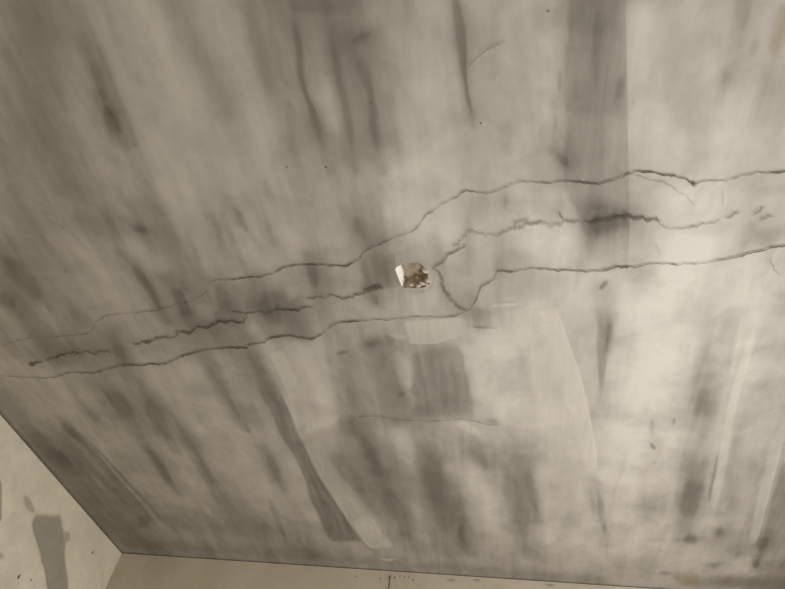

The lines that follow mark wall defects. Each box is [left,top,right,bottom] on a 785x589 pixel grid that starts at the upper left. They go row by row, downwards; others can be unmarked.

crack [538,171,785,186]
crack [594,214,659,223]
crack [231,240,390,280]
crack [715,245,785,262]
spalling [395,262,432,288]
crack [415,263,696,318]
crack [30,285,394,378]